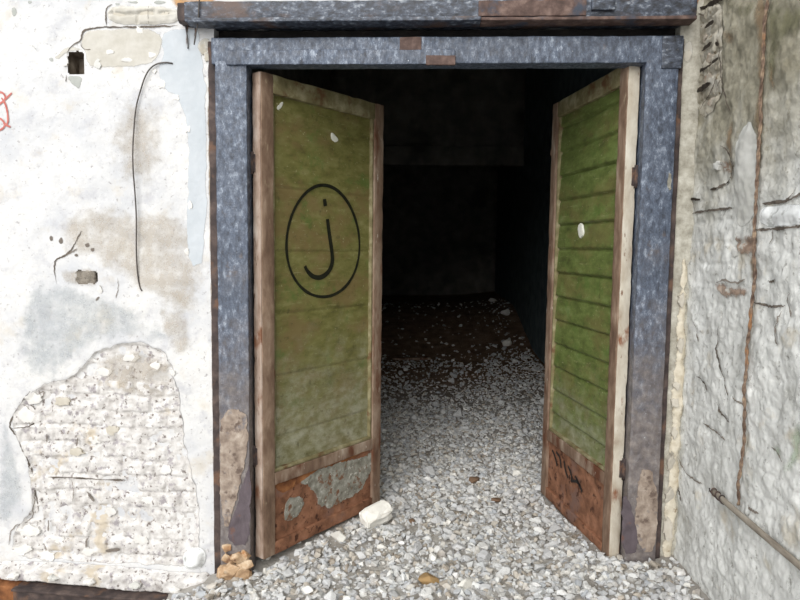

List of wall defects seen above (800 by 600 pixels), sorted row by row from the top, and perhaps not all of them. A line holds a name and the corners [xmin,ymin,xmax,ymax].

spalling [683,3,723,117]
peeling [50,1,209,266]
crack [53,231,82,284]
crack [754,294,792,345]
peeling [635,259,688,557]
crack [693,322,743,440]
spalling [0,342,210,594]
peeling [220,409,249,527]